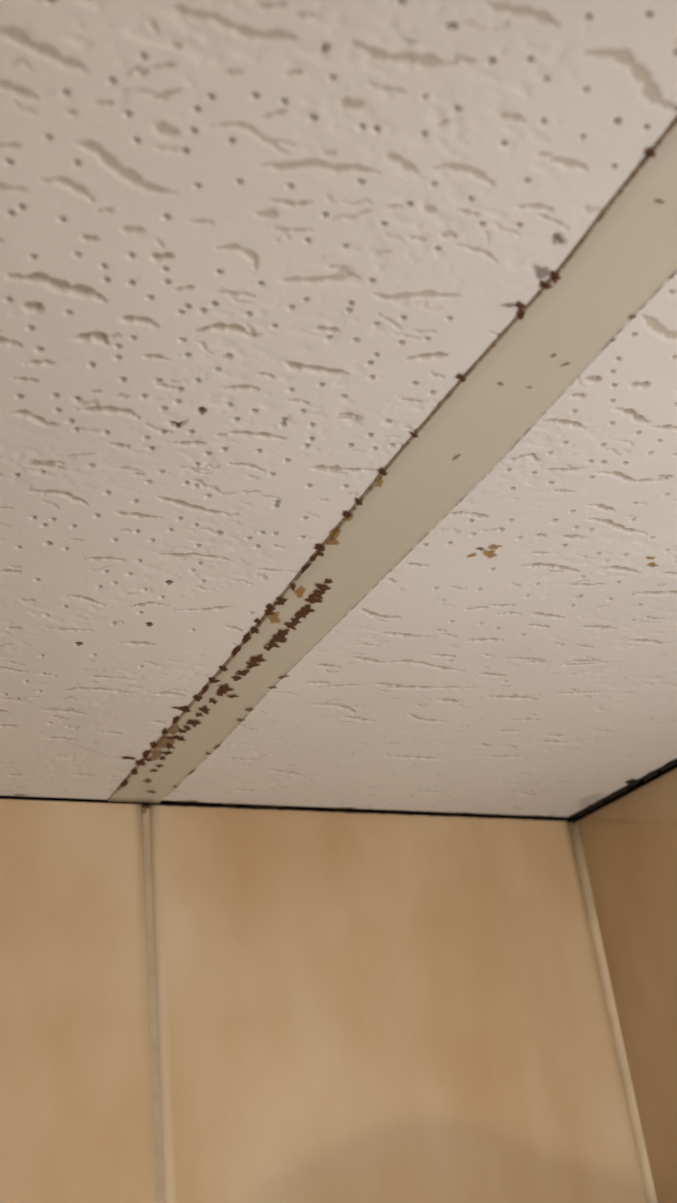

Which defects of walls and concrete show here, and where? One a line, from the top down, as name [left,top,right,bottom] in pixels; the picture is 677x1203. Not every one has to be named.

rust [115,119,677,794]